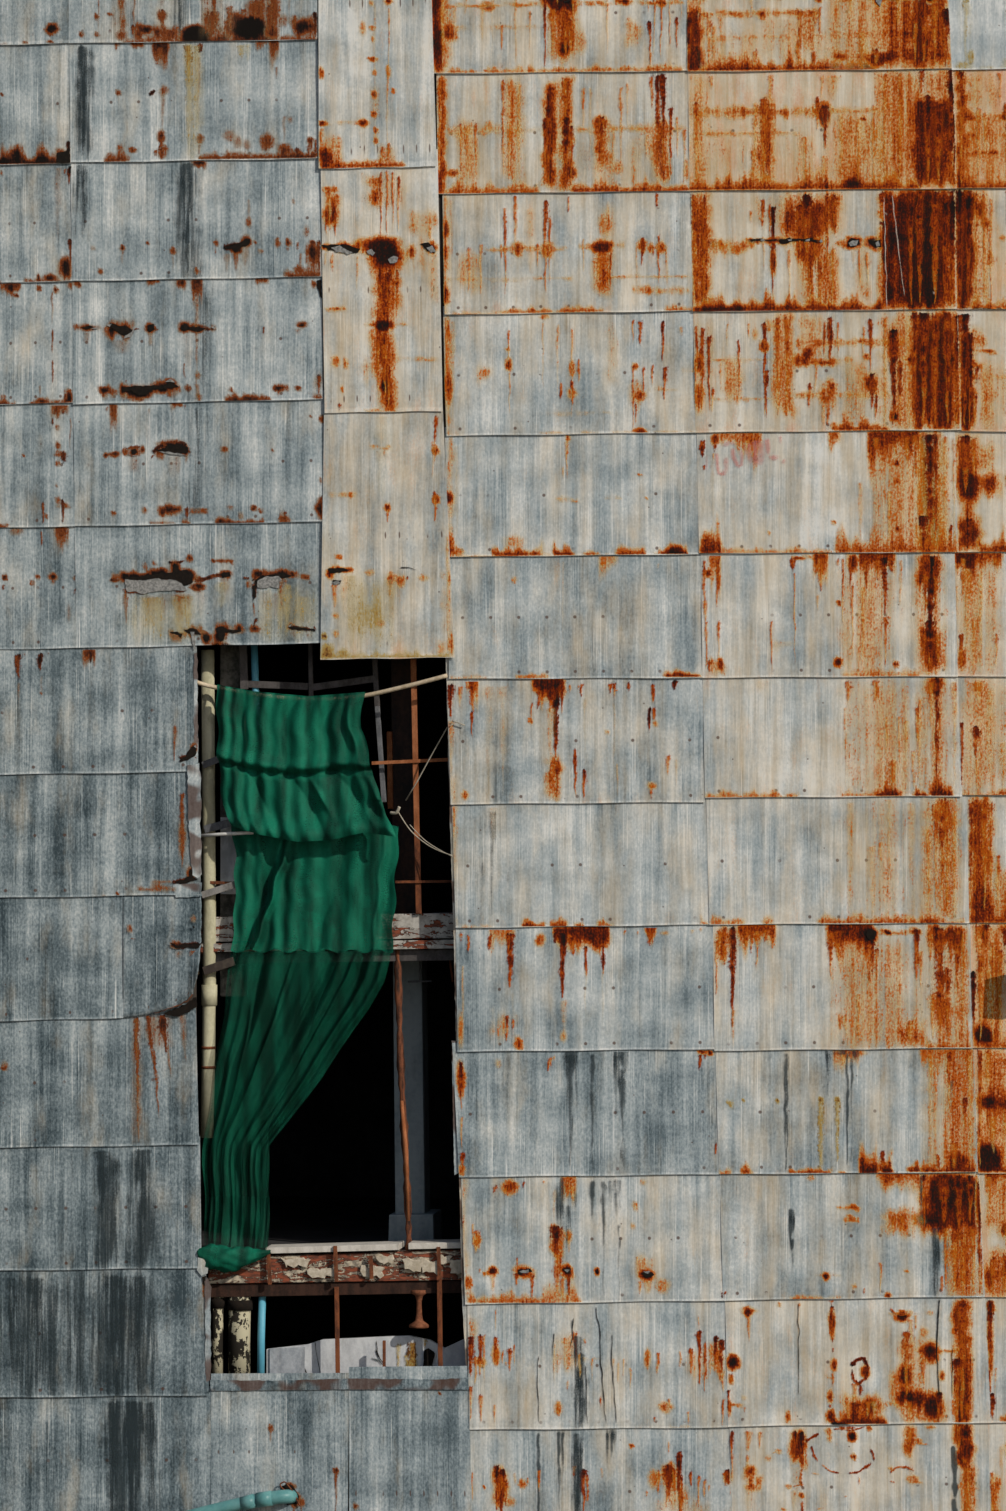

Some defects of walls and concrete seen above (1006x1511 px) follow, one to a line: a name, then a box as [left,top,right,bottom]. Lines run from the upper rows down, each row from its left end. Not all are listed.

corrosion [43,23,59,43]
corrosion [0,140,71,197]
corrosion [79,0,407,412]
corrosion [0,238,81,306]
corrosion [107,404,118,426]
corrosion [225,357,349,423]
corrosion [314,478,323,519]
corrosion [320,0,1006,1511]